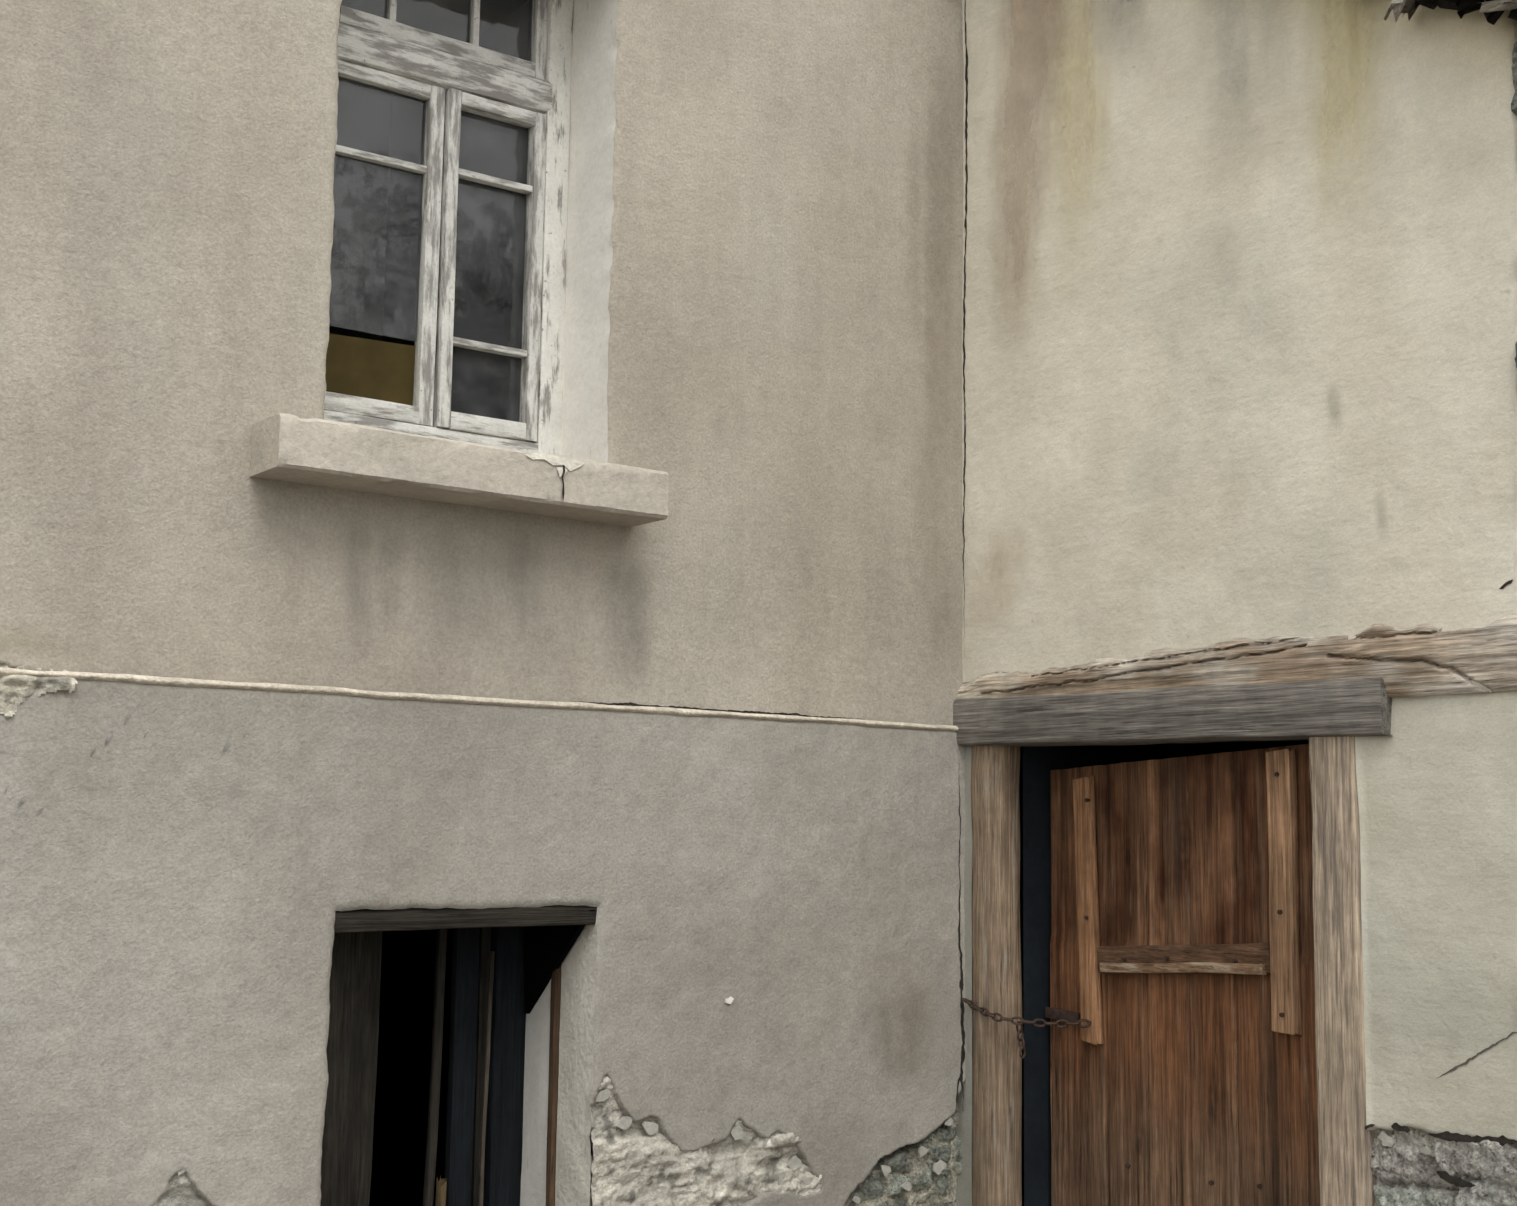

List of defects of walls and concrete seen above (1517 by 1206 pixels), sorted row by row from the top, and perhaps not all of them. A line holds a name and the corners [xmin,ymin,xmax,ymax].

peeling [0,664,78,719]
crack [956,786,965,1106]
crack [1437,1032,1517,1078]
spalling [153,1169,217,1206]
spalling [590,1076,822,1206]
spalling [845,1107,962,1206]